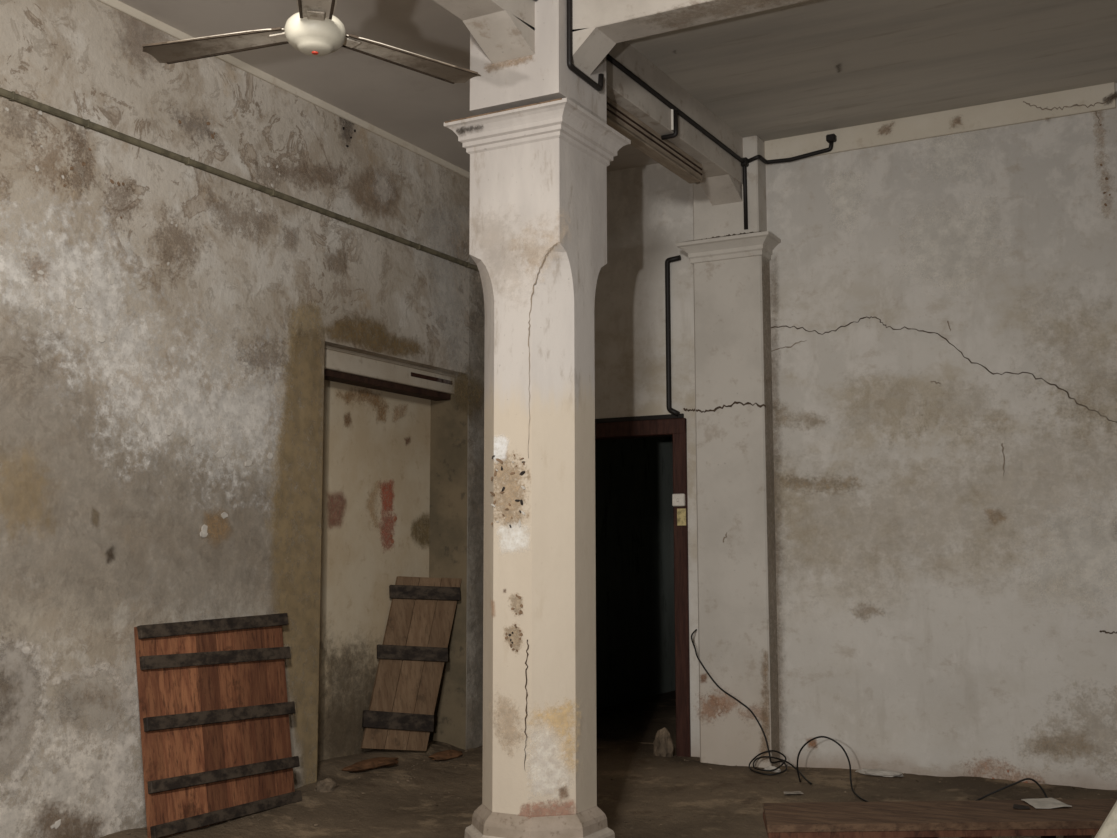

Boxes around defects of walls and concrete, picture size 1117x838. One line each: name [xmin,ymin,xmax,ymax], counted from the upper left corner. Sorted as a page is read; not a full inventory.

crack [1023,93,1117,124]
water stain [0,201,295,497]
water stain [326,317,420,355]
crack [771,316,1117,423]
crack [683,401,766,413]
flaking render [380,482,397,547]
peeling [490,437,529,552]
flaking render [505,594,523,652]
crack [522,640,530,769]